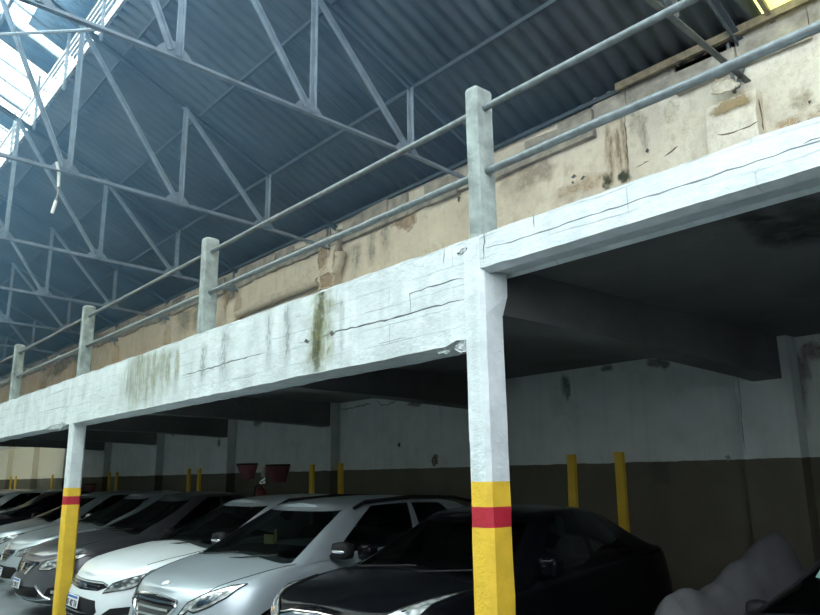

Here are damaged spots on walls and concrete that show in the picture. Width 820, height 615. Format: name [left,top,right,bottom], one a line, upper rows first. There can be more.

crack [624,116,678,178]
crack [717,101,764,136]
crack [483,137,820,259]
flaking render [316,244,335,291]
crack [301,254,464,344]
damp [310,301,332,368]
damp [129,351,179,393]